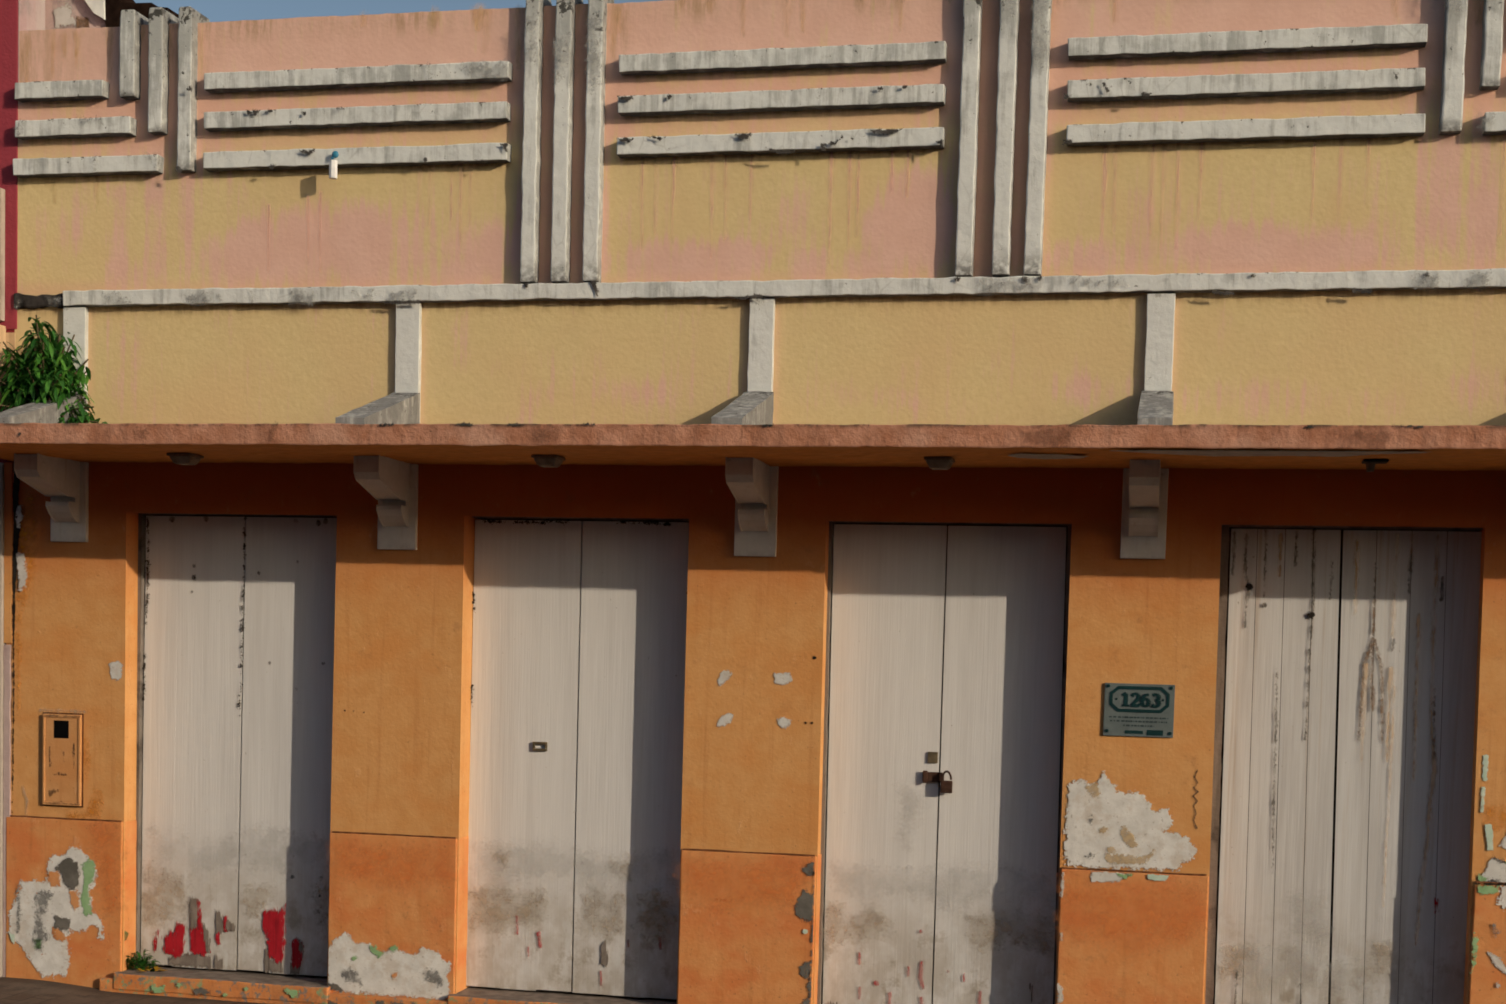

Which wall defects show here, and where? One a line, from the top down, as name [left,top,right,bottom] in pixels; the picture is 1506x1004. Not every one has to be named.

peeling [717,669,733,687]
peeling [717,713,733,727]
peeling [773,672,793,685]
peeling [777,716,791,729]
peeling [1059,771,1198,897]
peeling [1480,754,1506,851]
peeling [6,846,105,978]
peeling [326,932,451,1004]
spalling [794,861,815,1004]
peeling [1469,885,1506,988]